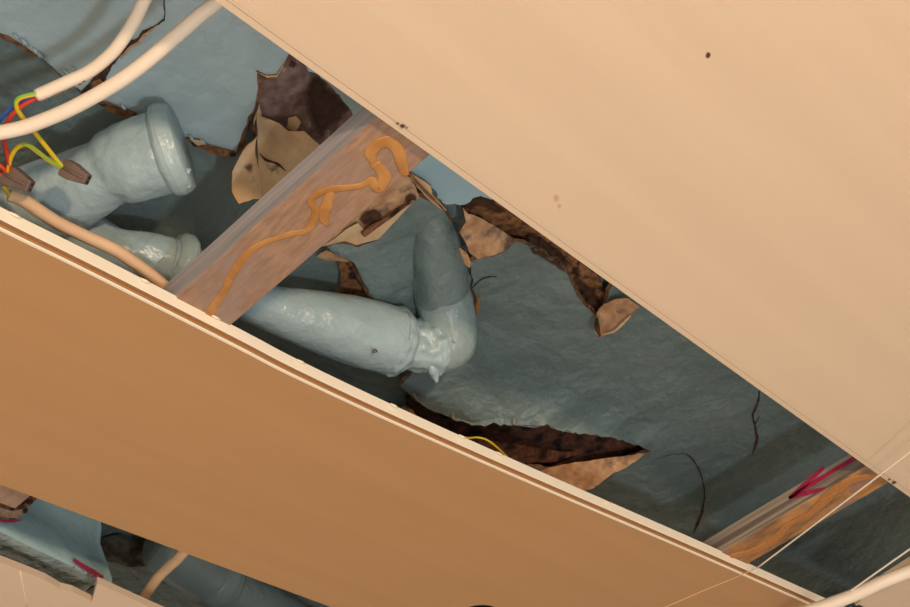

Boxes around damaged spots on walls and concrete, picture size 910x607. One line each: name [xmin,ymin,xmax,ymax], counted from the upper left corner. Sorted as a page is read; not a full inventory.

peeling [316,154,849,542]
crack [752,391,760,455]
crack [657,453,705,533]
peeling [749,482,910,598]